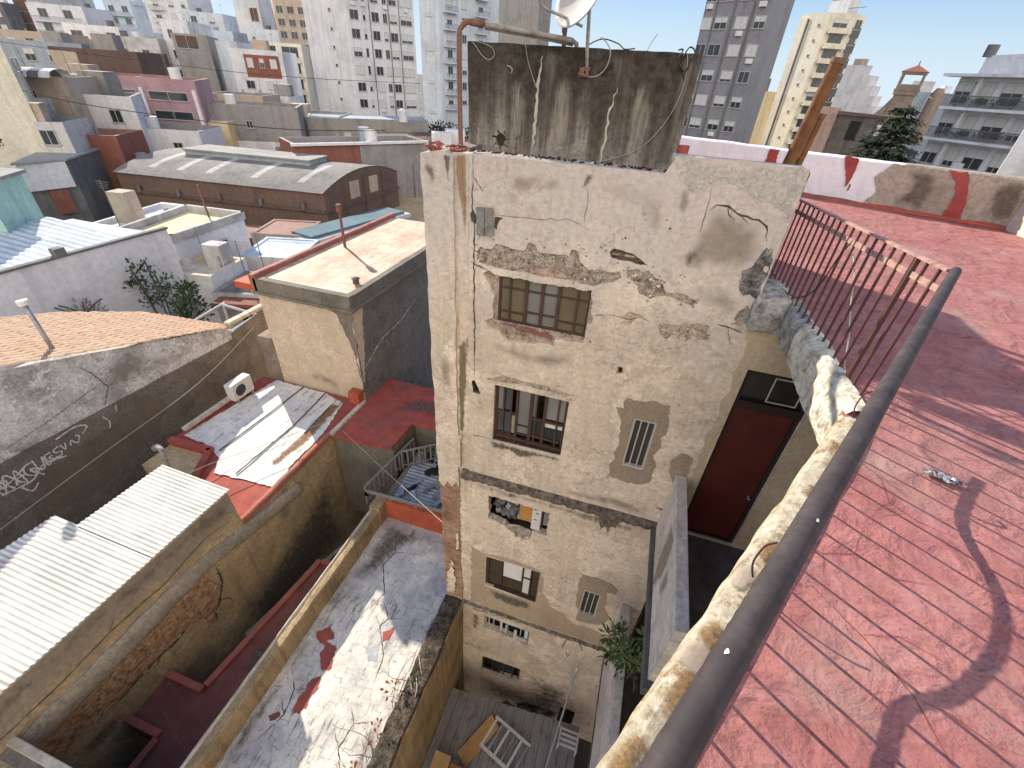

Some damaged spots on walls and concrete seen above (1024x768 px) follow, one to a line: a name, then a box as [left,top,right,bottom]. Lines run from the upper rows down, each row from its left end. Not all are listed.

damp [531,52,568,154]
crack [600,87,618,163]
damp [665,60,692,164]
corrosion [457,156,466,224]
crack [700,189,768,242]
damp [904,175,933,205]
spalling [467,217,699,343]
peeling [657,319,710,345]
crack [0,518,233,741]
spalling [40,577,221,760]
peeling [293,625,337,715]
peeling [446,533,611,648]